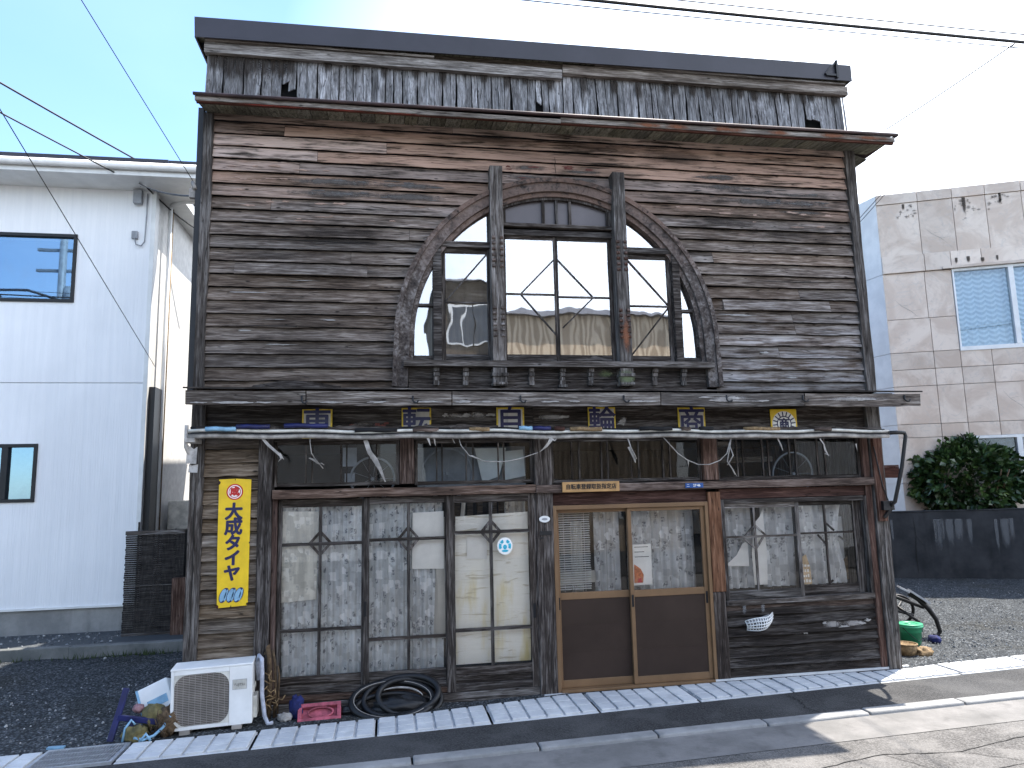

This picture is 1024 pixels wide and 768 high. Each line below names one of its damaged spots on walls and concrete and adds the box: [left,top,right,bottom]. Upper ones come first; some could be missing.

damp [933,519,972,542]
damp [994,518,1014,545]